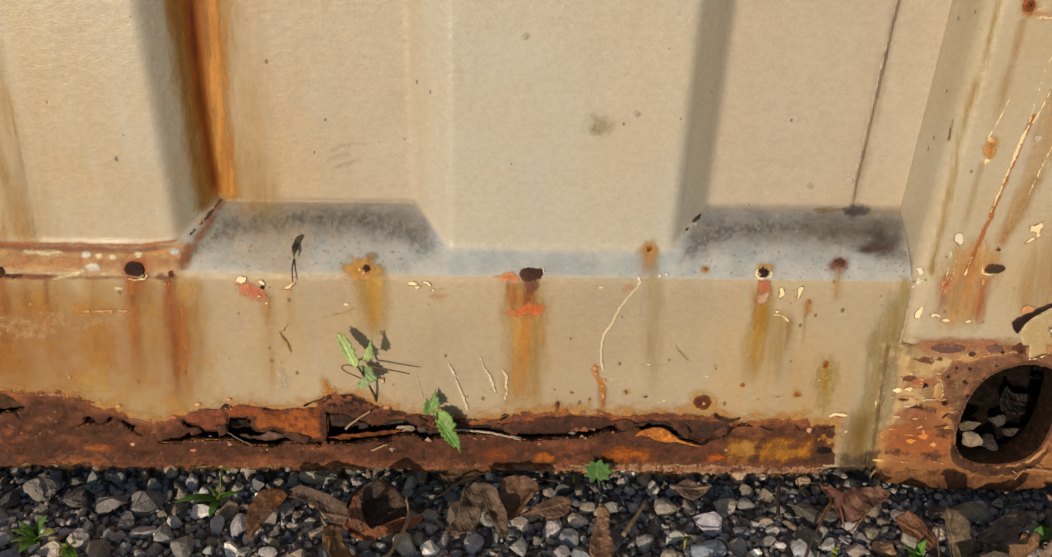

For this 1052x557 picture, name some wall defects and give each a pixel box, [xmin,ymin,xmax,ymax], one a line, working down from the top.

rust [0,0,842,475]
rust [869,241,1052,490]
peeling [1011,304,1052,360]